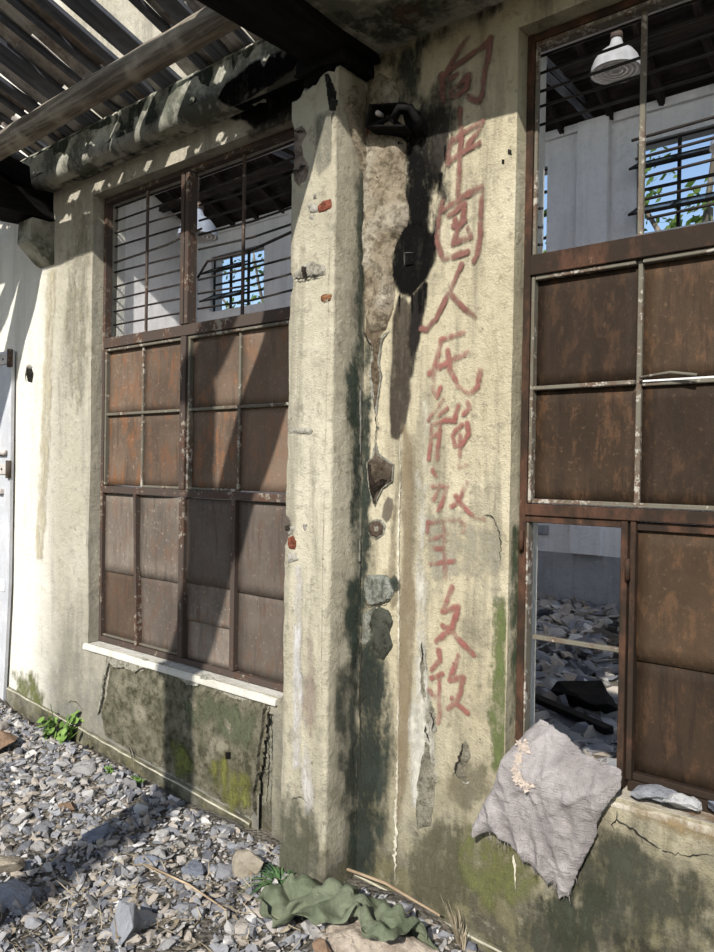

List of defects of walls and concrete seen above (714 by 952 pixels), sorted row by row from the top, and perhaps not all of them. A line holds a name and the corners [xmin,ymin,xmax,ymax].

leakage [21,95,158,163]
leakage [168,65,214,96]
leakage [218,39,311,129]
peeling [366,442,395,540]
leakage [334,172,434,875]
peeling [361,606,393,668]
leakage [183,695,254,748]
peeling [416,643,437,830]
spalling [449,740,486,809]
leakage [409,821,465,915]
leakage [526,834,713,952]
crack [611,812,712,857]